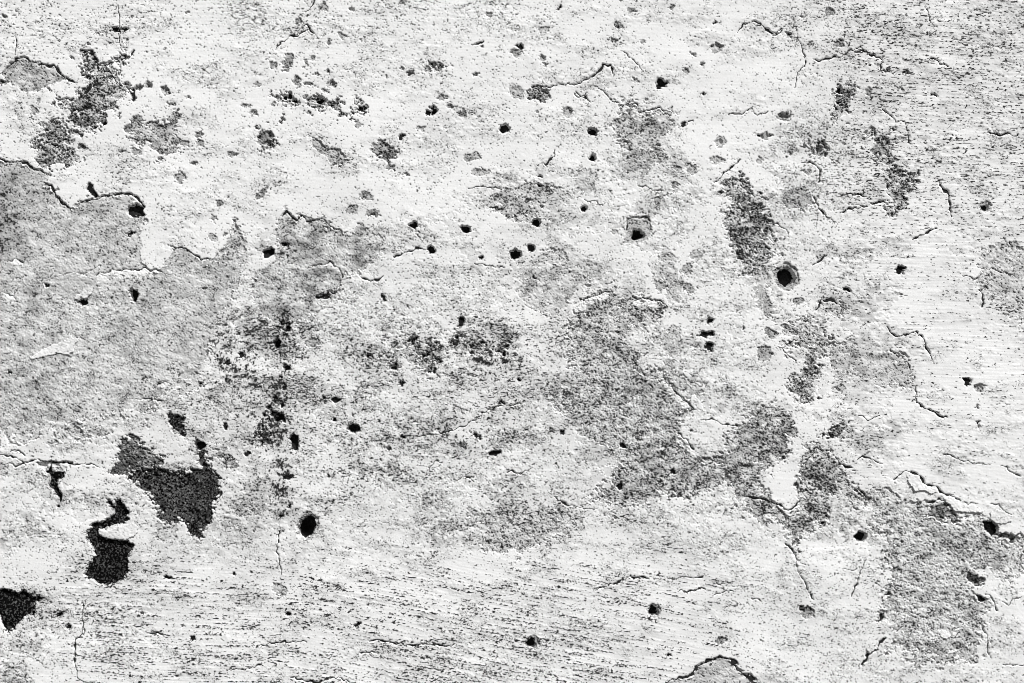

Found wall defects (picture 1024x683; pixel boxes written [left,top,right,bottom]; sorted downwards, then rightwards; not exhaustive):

crack [533,51,694,127]
crack [737,21,896,88]
flaking render [0,43,384,538]
crack [857,454,1020,515]
flaking render [85,499,139,585]
flaking render [0,588,42,633]